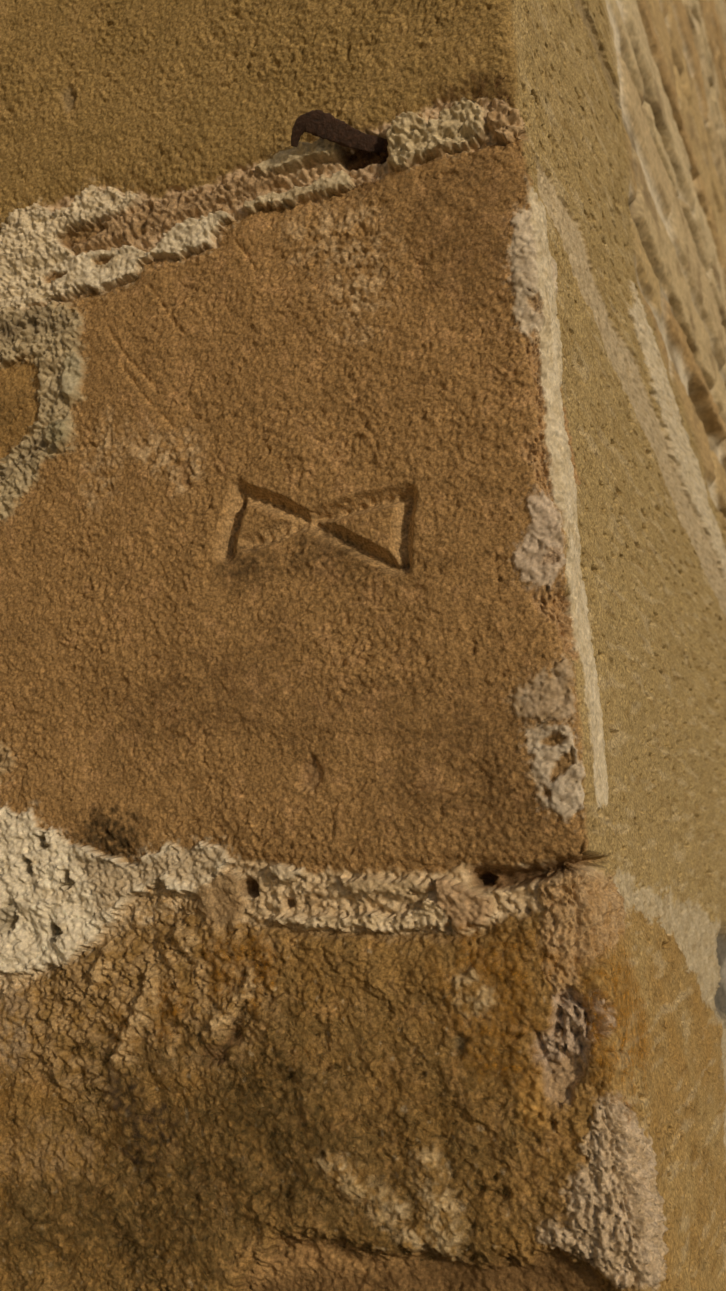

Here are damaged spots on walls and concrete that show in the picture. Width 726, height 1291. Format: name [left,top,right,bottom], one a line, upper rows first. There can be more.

flaking render [509,206,586,821]
crack [247,853,609,945]
spalling [235,1089,669,1291]